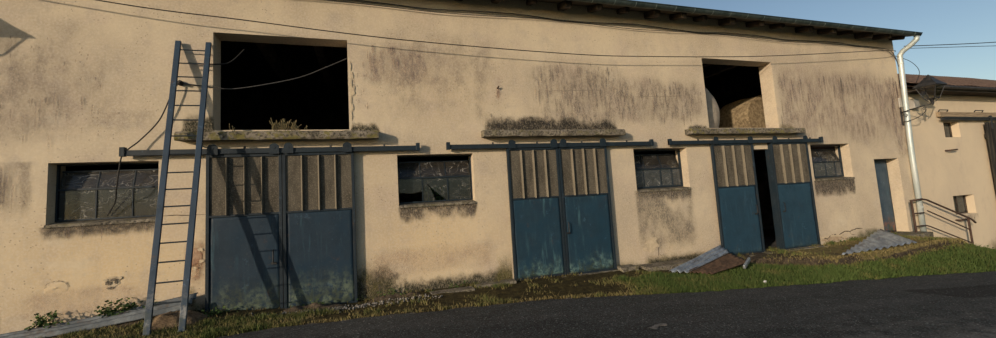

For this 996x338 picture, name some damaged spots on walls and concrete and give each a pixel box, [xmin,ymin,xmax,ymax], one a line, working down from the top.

leakage [487,85,616,130]
spalling [103,276,122,290]
leakage [357,266,513,302]